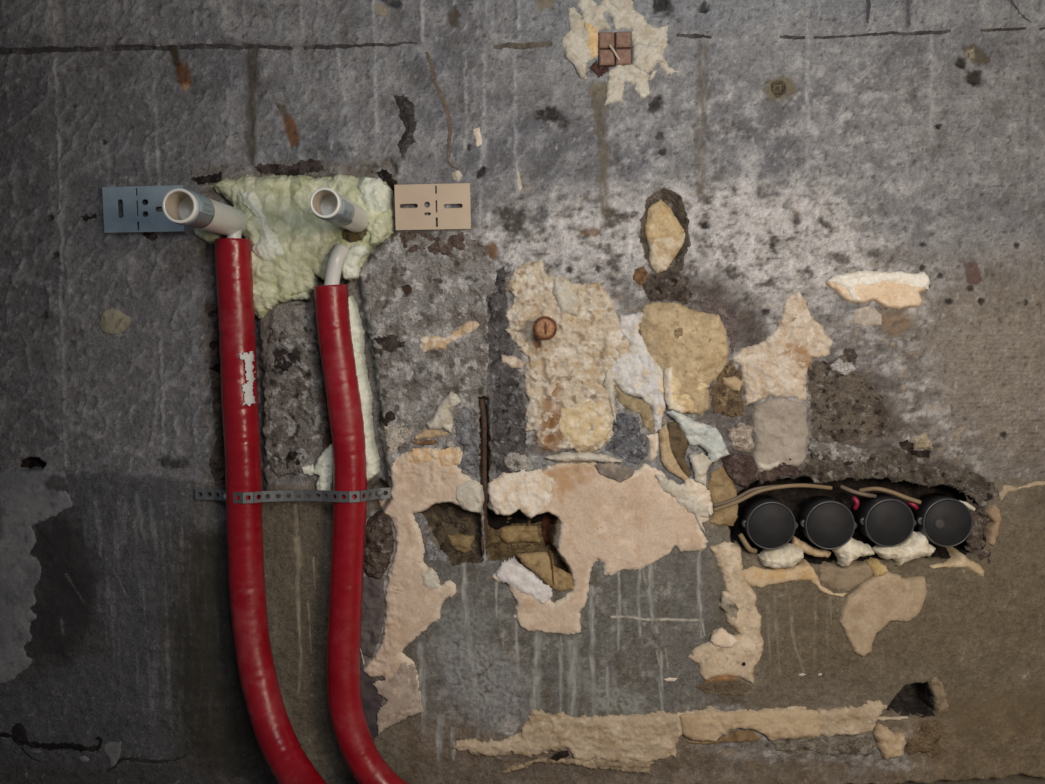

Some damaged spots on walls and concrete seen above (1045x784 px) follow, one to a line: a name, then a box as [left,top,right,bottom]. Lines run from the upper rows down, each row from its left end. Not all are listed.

crack [494,41,553,49]
crack [779,0,951,40]
crack [980,0,1045,32]
crack [0,41,459,170]
spalling [342,221,659,483]
spalling [633,187,779,471]
spalling [807,348,890,463]
peeling [825,270,930,310]
spalling [415,502,573,591]
leakage [180,531,258,766]
peeling [839,547,984,657]
crack [0,723,187,772]